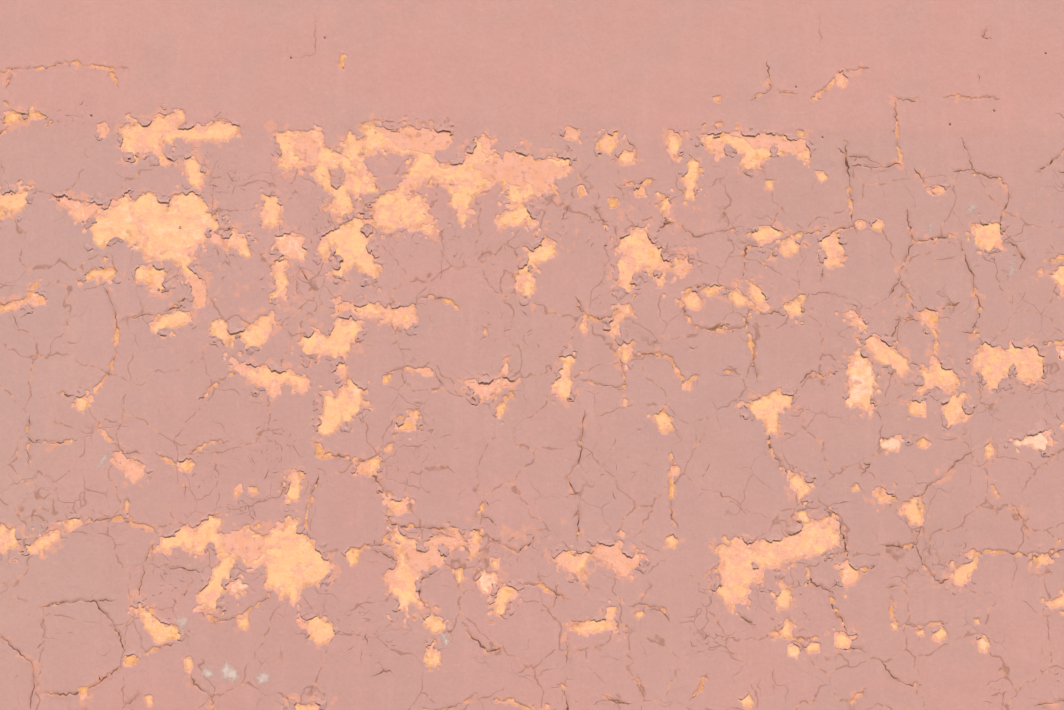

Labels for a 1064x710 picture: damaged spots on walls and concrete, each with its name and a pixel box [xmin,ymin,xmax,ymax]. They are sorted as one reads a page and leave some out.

crack [788,96,924,239]
peeling [48,104,636,460]
peeling [579,220,813,370]
crack [576,214,839,390]
crack [888,210,982,365]
peeling [835,305,1064,429]
crack [1,599,172,710]
peeling [154,466,363,645]
crack [304,443,446,561]
peeling [376,487,524,671]
peeling [708,464,860,659]
crack [797,566,917,687]